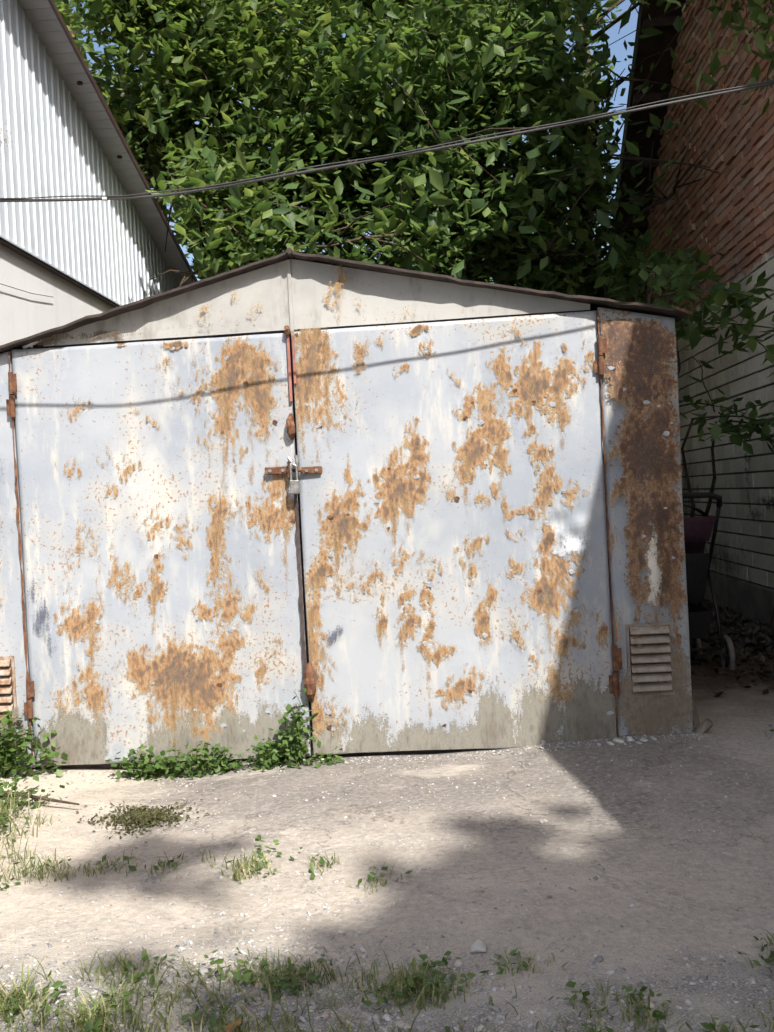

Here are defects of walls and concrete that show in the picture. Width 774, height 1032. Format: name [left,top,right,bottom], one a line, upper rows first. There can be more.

corrosion [53,328,384,746]
corrosion [323,267,351,313]
corrosion [394,309,436,359]
corrosion [305,317,693,741]